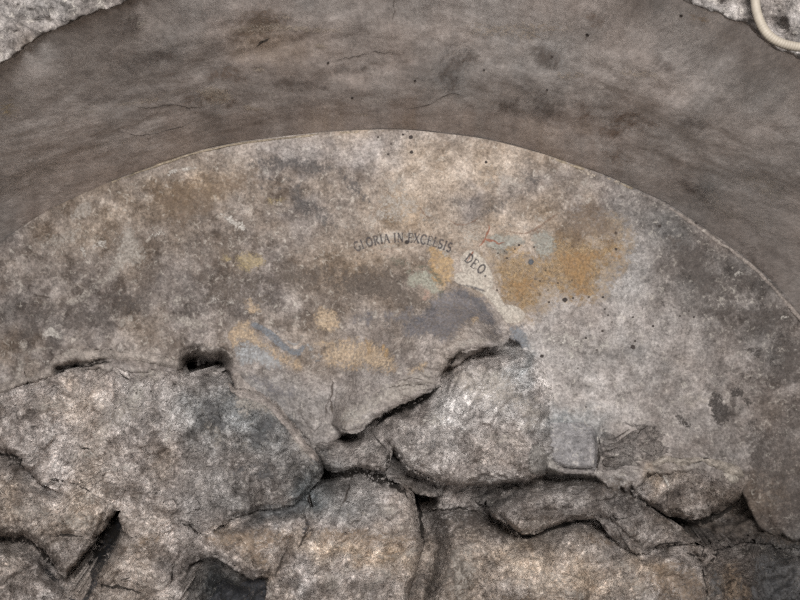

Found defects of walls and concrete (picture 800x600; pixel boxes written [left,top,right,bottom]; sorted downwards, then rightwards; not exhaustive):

rust [497,203,623,309]
crack [60,361,129,380]
peeling [0,343,232,393]
crack [325,376,334,413]
crack [387,377,427,388]
crack [374,436,390,470]
crack [572,425,648,471]
crack [424,506,489,516]
crack [275,514,310,578]
crack [652,542,716,589]
crack [101,577,142,594]